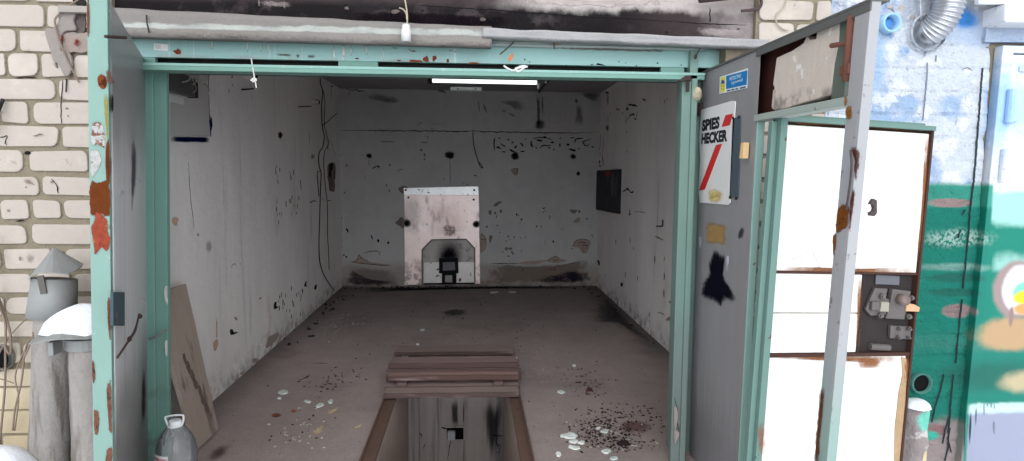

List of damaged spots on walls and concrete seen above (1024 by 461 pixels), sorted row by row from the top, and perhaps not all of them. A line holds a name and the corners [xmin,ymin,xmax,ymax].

peeling [90,122,105,177]
rust [832,148,860,255]